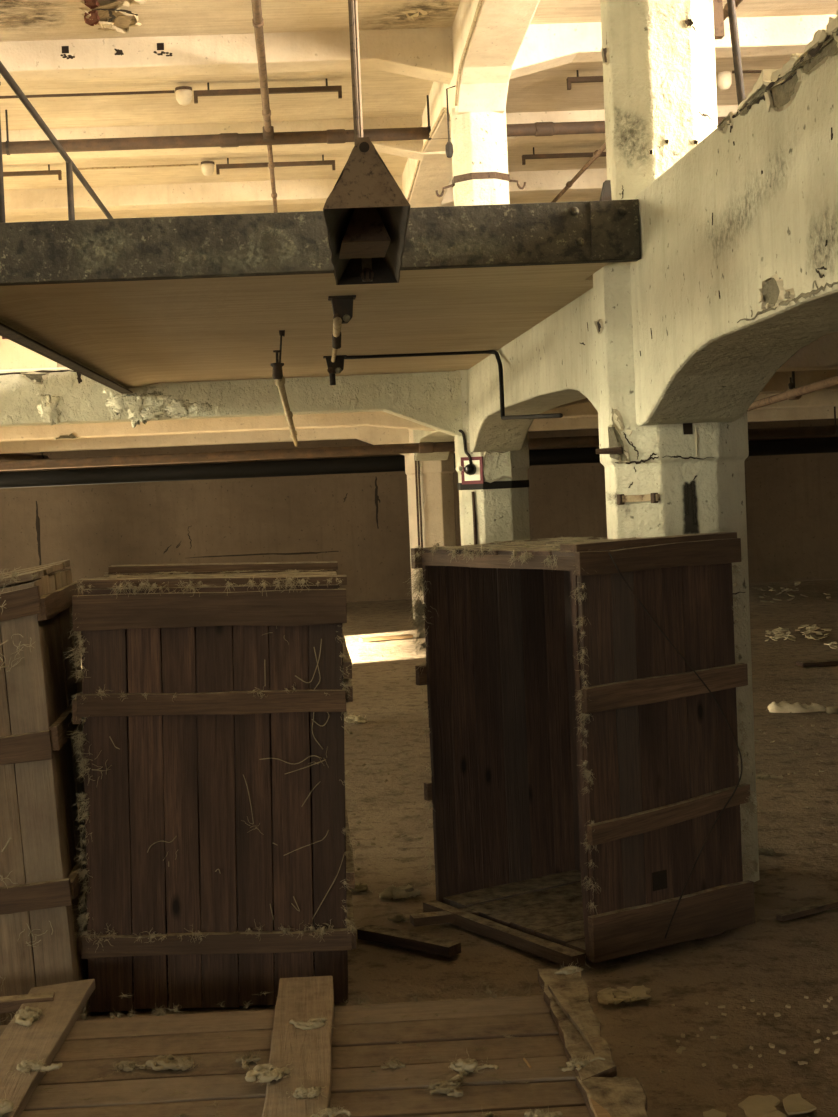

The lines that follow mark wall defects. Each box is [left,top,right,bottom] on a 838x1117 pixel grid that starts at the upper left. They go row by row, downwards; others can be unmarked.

damp [0,2,53,24]
spalling [79,0,148,33]
spalling [717,10,838,146]
crack [737,266,838,323]
crack [615,432,714,488]